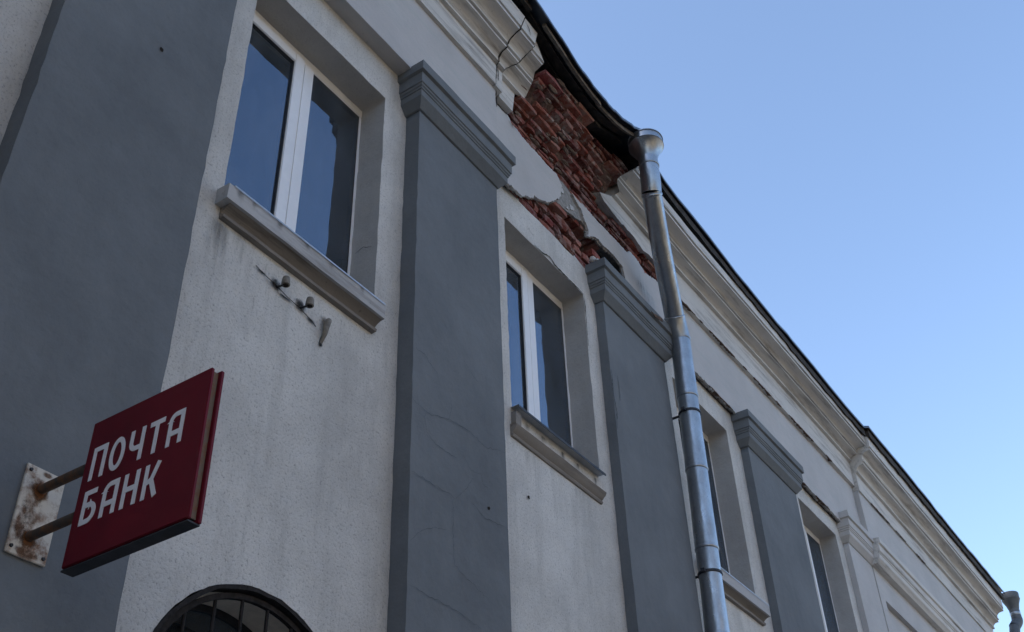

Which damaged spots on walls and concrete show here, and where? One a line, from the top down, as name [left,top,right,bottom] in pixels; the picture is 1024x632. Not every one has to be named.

crack [496,17,535,115]
spalling [504,70,657,281]